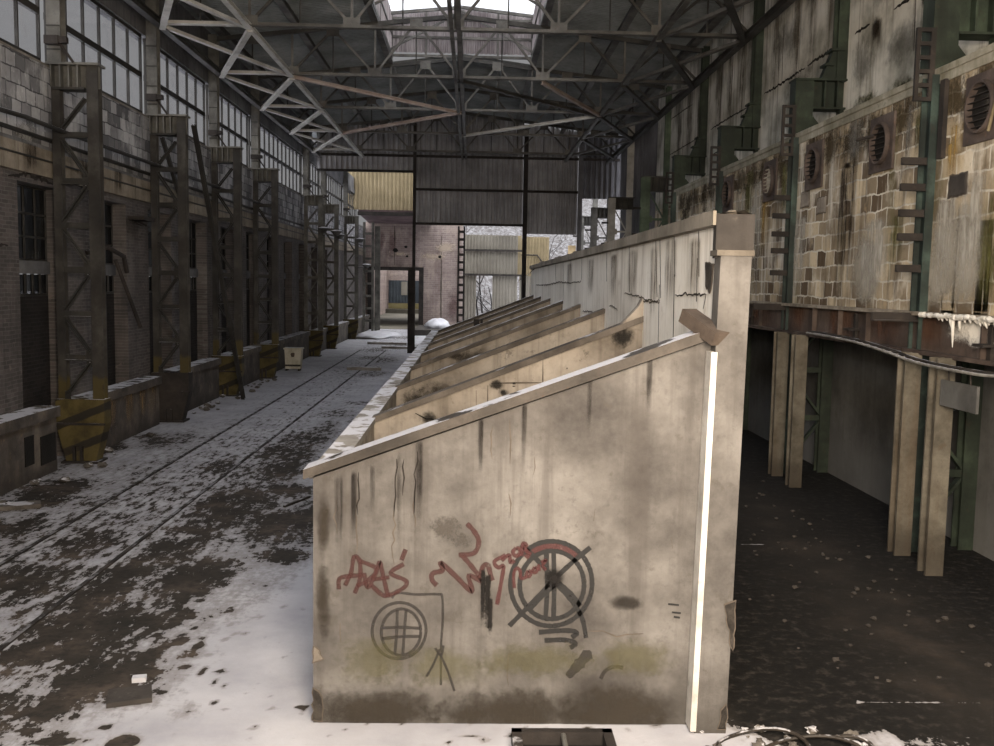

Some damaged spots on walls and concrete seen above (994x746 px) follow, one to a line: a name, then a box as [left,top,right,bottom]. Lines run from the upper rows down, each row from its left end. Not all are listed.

damp [938,176,994,282]
crack [537,260,582,286]
crack [583,231,706,335]
crack [487,367,543,402]
damp [337,474,356,520]